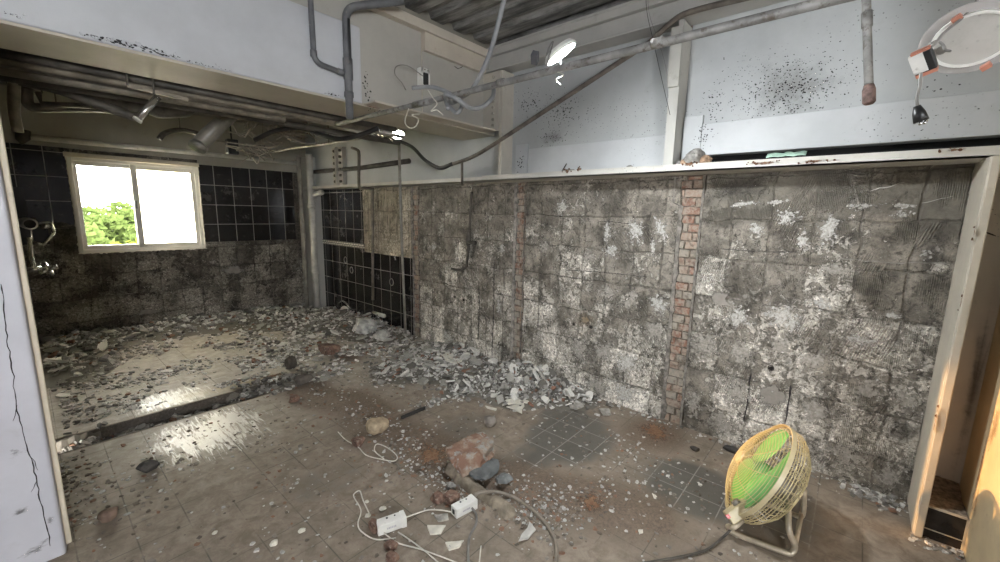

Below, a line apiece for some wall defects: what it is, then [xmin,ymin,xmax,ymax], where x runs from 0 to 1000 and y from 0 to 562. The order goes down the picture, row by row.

leakage [694,41,860,149]
peeling [730,199,843,251]
peeling [846,203,917,218]
spalling [410,187,437,342]
spalling [496,182,544,361]
peeling [817,262,858,279]
spalling [598,175,803,426]
peeling [793,350,836,375]
crack [1,285,50,544]
crack [743,374,751,421]
crack [784,385,792,423]
peeling [817,439,908,487]